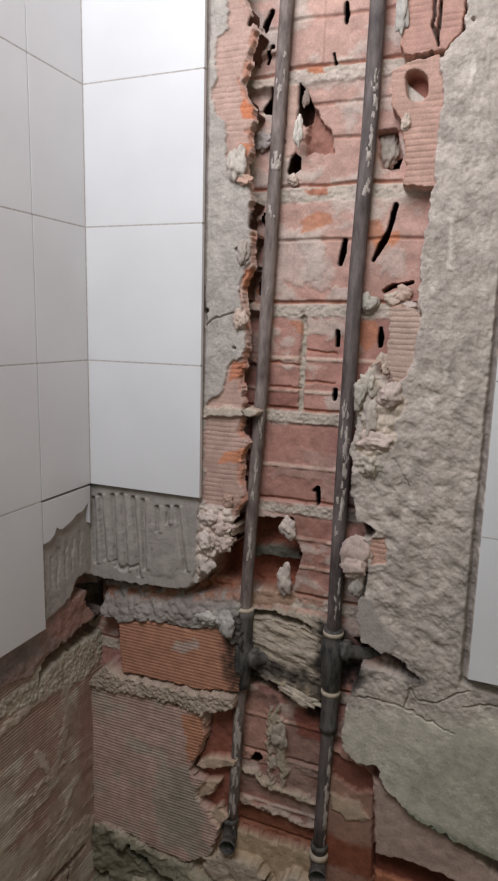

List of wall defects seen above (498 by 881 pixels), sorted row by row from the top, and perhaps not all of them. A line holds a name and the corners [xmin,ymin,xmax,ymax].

spalling [283,78,339,187]
spalling [379,0,467,189]
spalling [202,0,273,546]
spalling [361,284,422,382]
spalling [119,609,240,692]
crack [356,636,498,736]